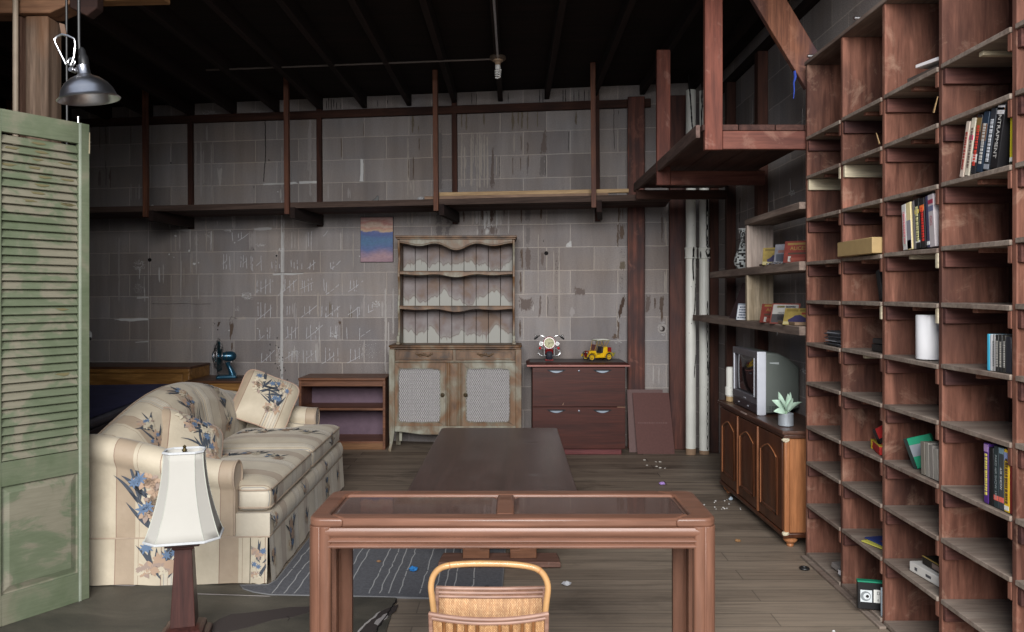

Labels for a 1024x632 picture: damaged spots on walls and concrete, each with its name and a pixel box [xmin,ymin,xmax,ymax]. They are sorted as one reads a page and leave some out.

damp [461,132,497,189]